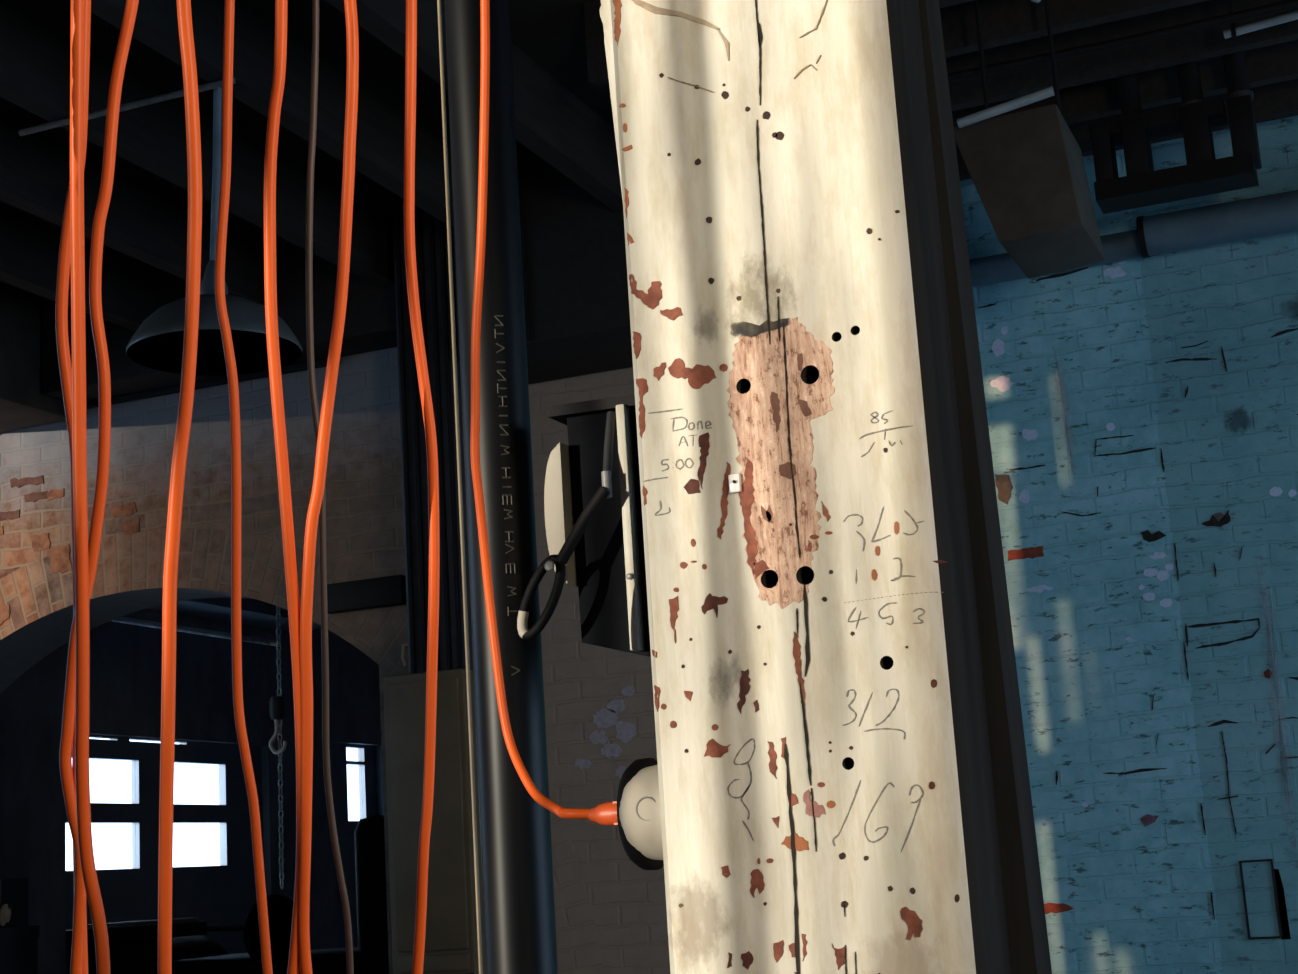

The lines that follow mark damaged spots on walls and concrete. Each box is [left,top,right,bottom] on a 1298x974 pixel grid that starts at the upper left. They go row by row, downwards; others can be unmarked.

peeling [633,332,641,359]
spalling [636,317,835,609]
crack [755,0,817,974]
crack [1172,543,1180,581]
crack [1183,618,1260,680]
crack [1265,717,1298,759]
crack [1200,720,1239,835]